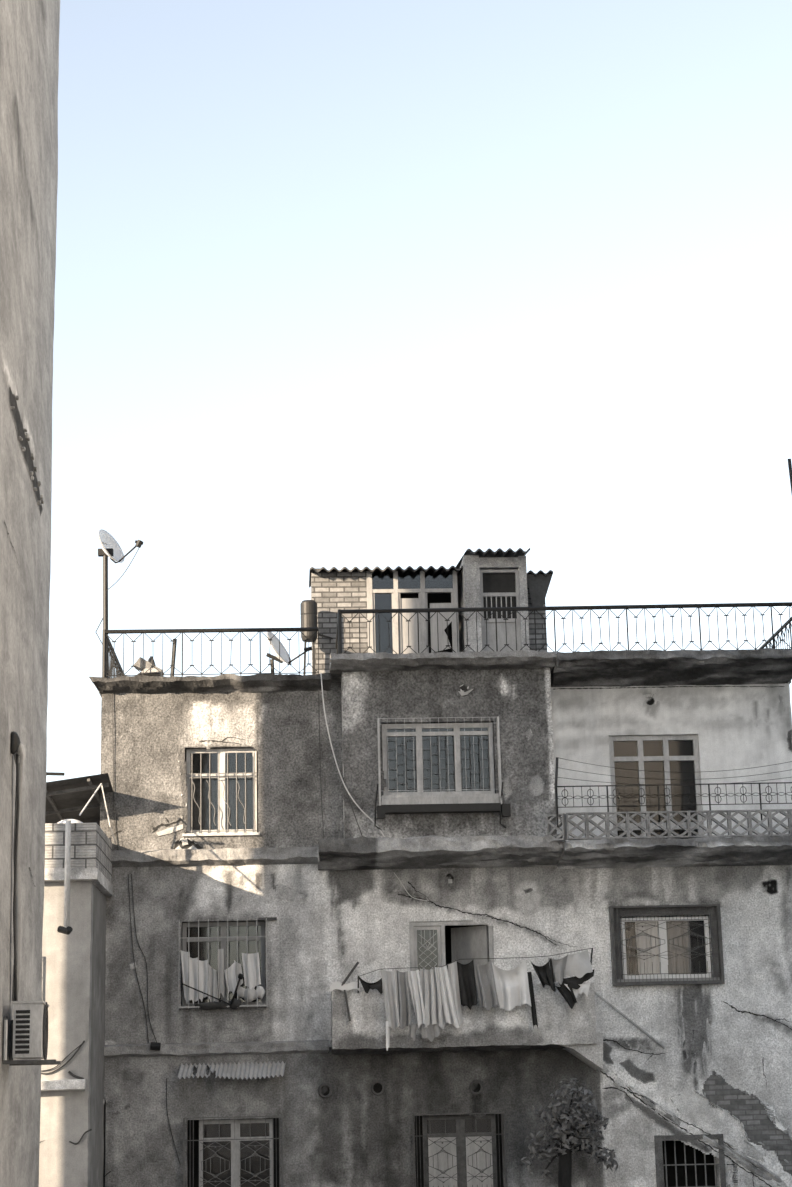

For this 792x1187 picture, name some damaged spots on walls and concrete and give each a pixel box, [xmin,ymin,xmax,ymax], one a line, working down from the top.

spalling [2,351,44,516]
crack [721,1001,792,1030]
peeling [603,1041,792,1187]